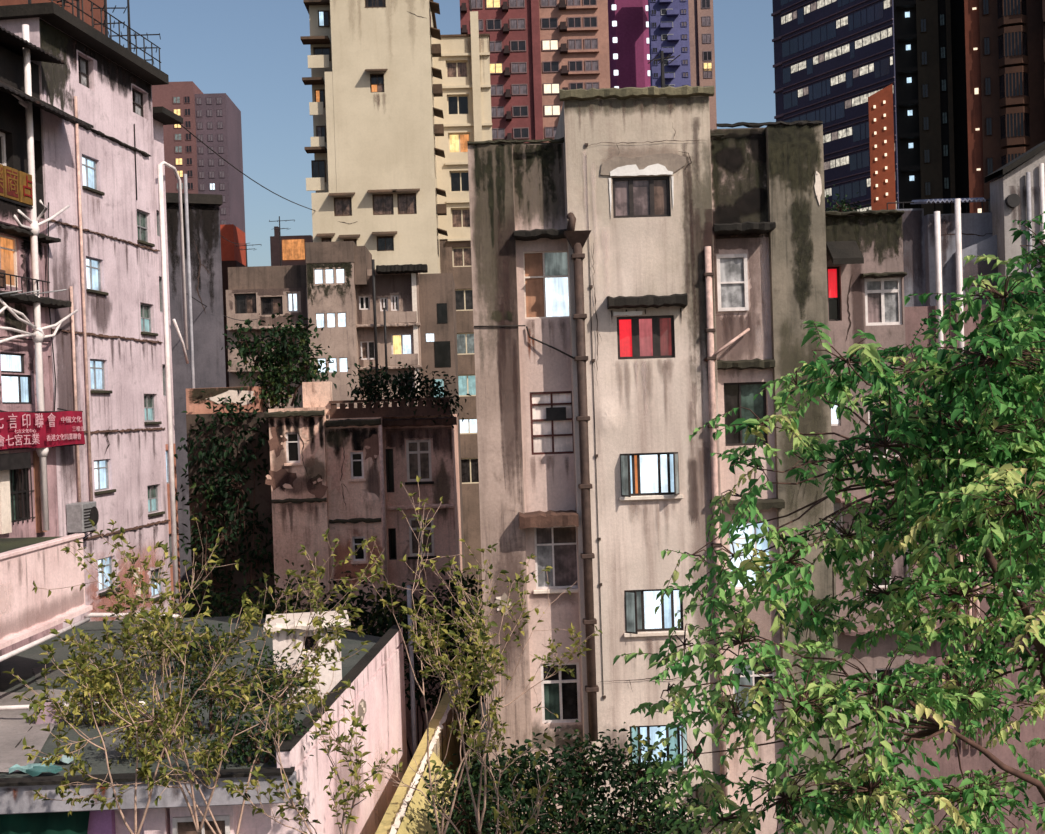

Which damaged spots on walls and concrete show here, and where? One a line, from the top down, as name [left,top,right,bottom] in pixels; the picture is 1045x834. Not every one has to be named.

water stain [0,196,30,223]
peeling [600,153,686,213]
water stain [21,237,42,291]
water stain [680,122,952,377]
water stain [4,303,28,335]
water stain [474,143,565,467]
crack [845,275,853,340]
peeling [265,421,349,498]
water stain [268,417,452,518]
water stain [689,462,697,518]